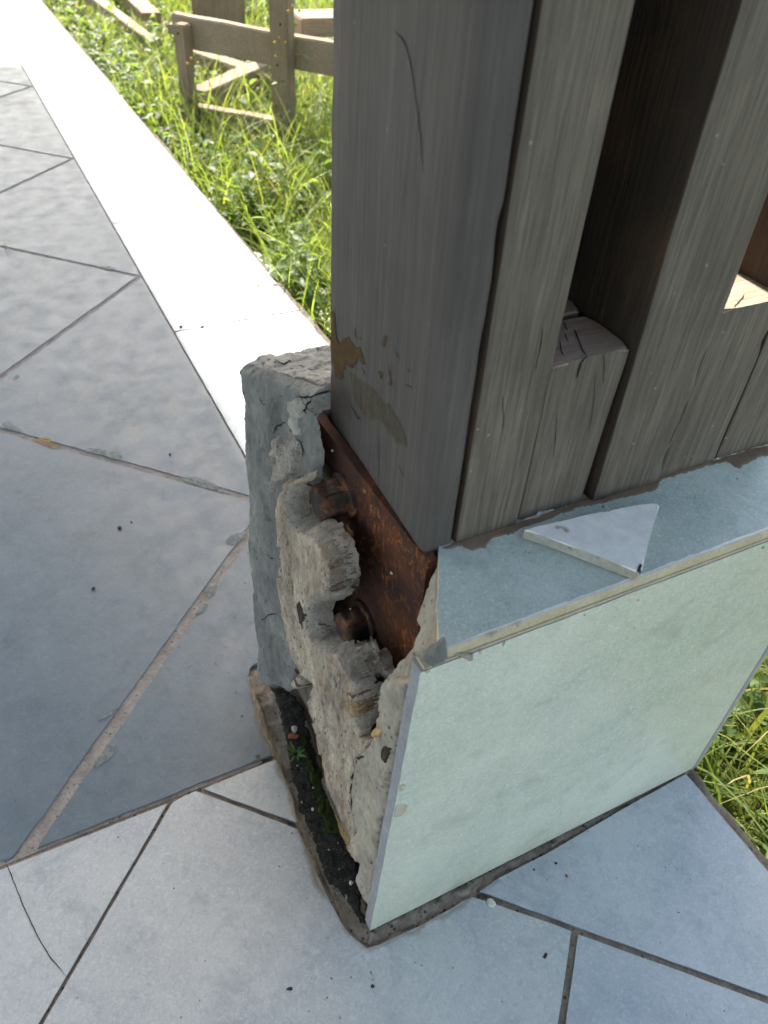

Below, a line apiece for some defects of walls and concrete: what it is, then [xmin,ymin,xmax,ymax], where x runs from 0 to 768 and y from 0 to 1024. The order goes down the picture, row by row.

crack [392,28,423,166]
spalling [268,398,395,862]
crack [6,863,65,975]